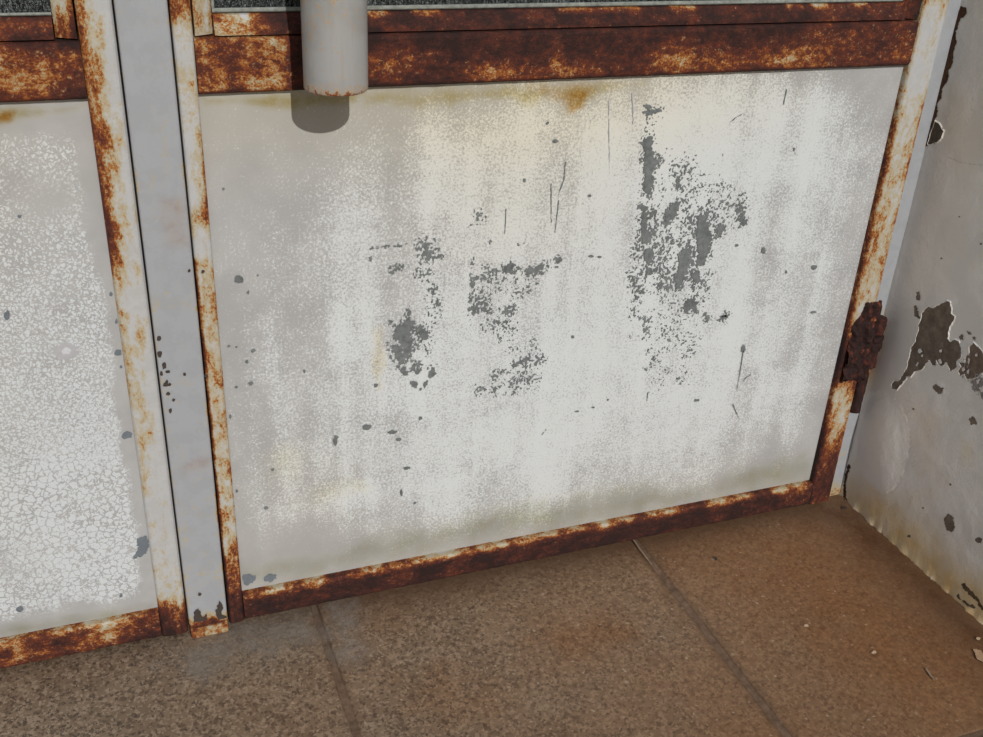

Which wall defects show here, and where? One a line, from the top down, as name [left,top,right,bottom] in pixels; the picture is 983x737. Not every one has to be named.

peeling [369,229,448,391]
peeling [467,254,563,398]
peeling [625,103,750,393]
peeling [891,291,983,399]